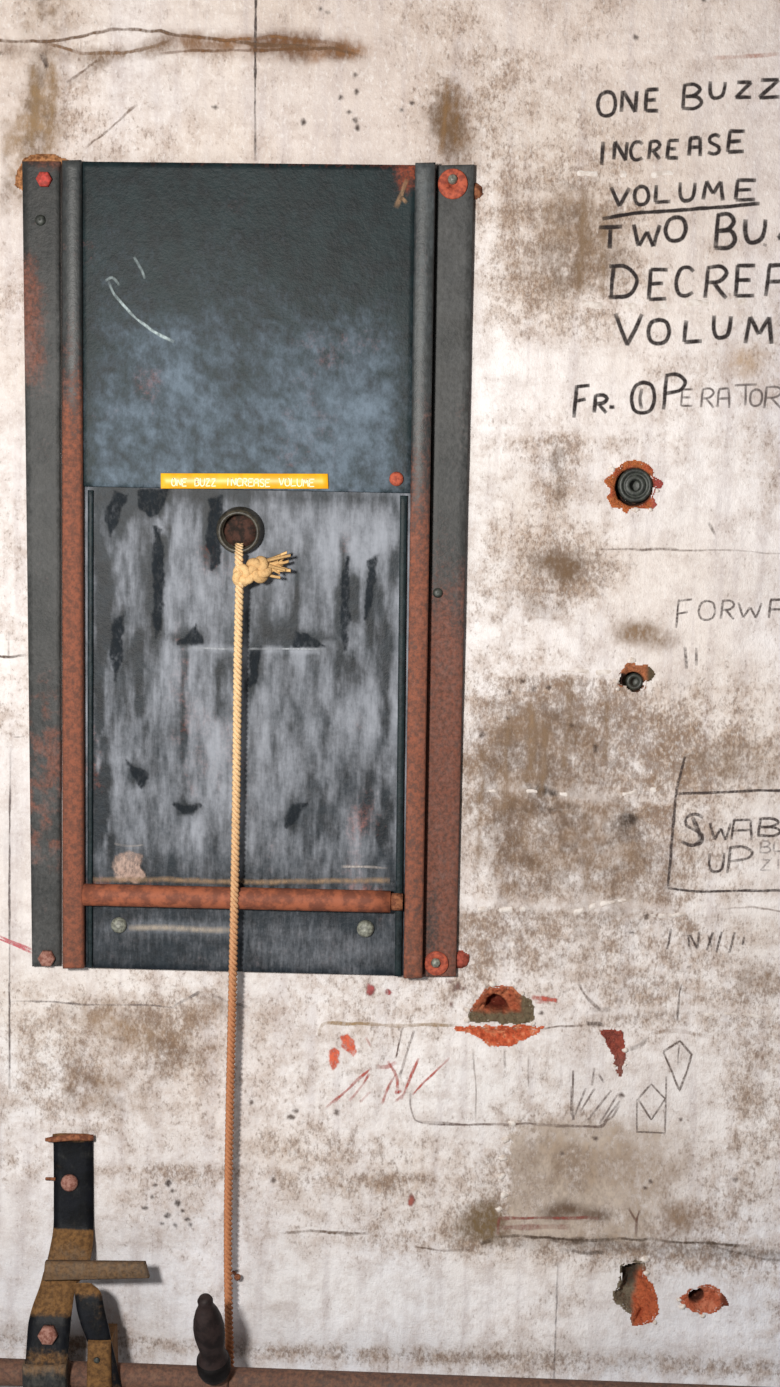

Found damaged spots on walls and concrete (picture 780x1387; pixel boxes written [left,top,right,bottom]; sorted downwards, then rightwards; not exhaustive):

crack [0,0,335,104]
corrosion [223,34,360,60]
spalling [604,460,663,513]
spalling [614,657,655,692]
spalling [449,981,557,1047]
peeling [329,1035,356,1069]
peeling [600,1029,628,1077]
peeling [495,1121,661,1326]
spalling [676,1284,729,1318]